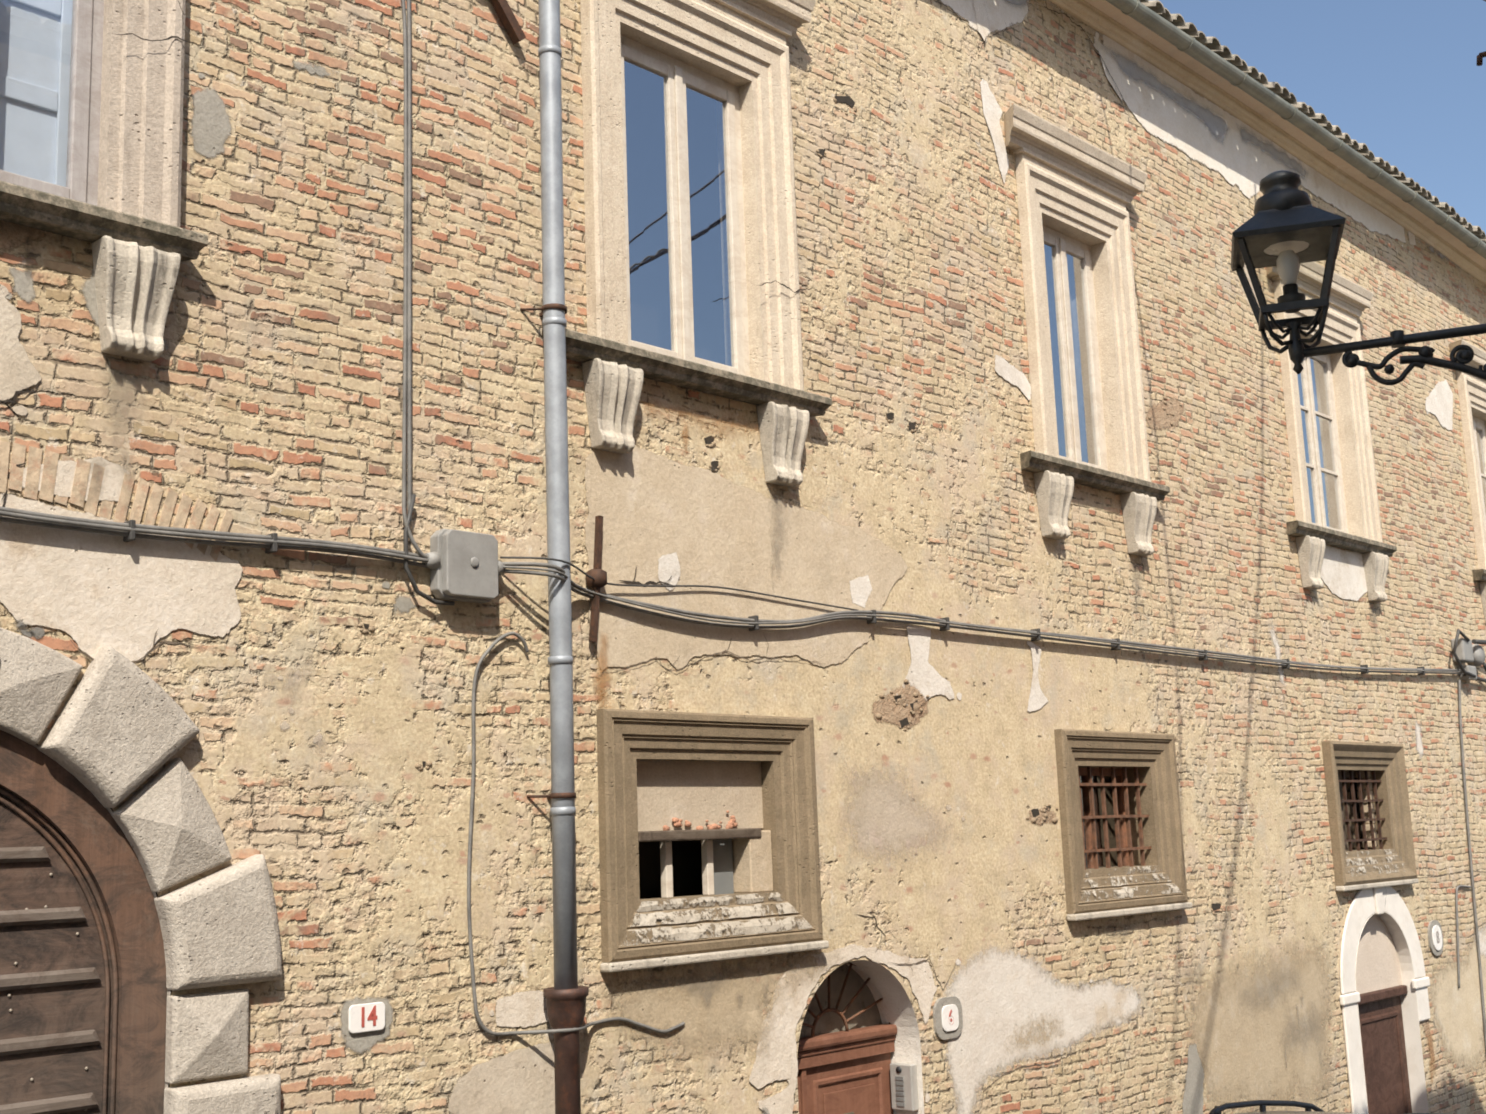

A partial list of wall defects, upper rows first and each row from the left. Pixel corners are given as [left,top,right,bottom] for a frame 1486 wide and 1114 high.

flaking render [941,0,1032,42]
flaking render [1084,22,1420,247]
flaking render [0,284,41,416]
crack [0,379,42,418]
crack [0,463,26,507]
flaking render [0,456,243,661]
crack [597,638,826,674]
flaking render [872,625,962,731]
flaking render [490,990,549,1028]
flaking render [613,944,1141,1114]
flaking render [448,1042,555,1114]